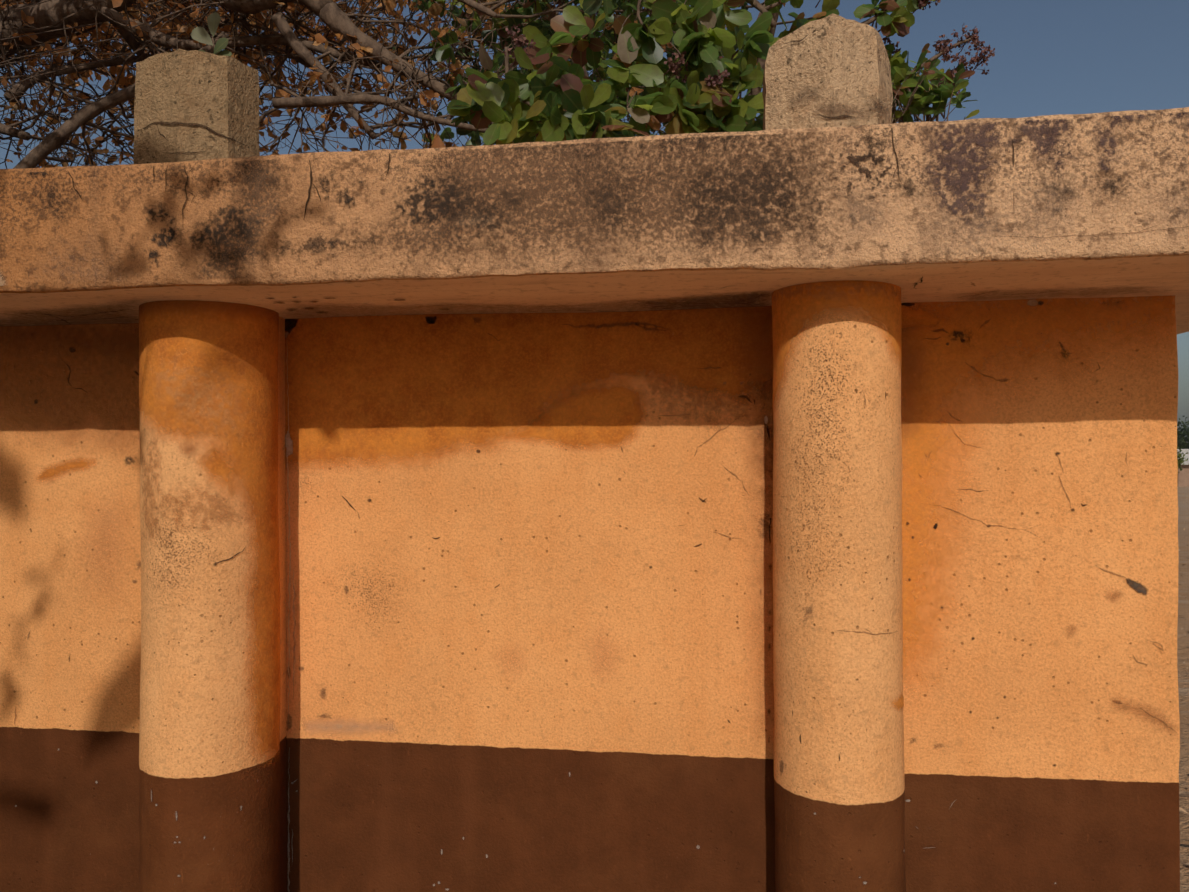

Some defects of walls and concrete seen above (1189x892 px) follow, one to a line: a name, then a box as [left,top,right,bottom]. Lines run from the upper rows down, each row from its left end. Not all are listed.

damp [145,205,175,266]
crack [140,121,247,226]
damp [190,160,282,279]
damp [281,132,822,253]
damp [835,136,915,197]
damp [926,122,1009,224]
damp [1021,114,1153,194]
damp [0,280,1175,752]